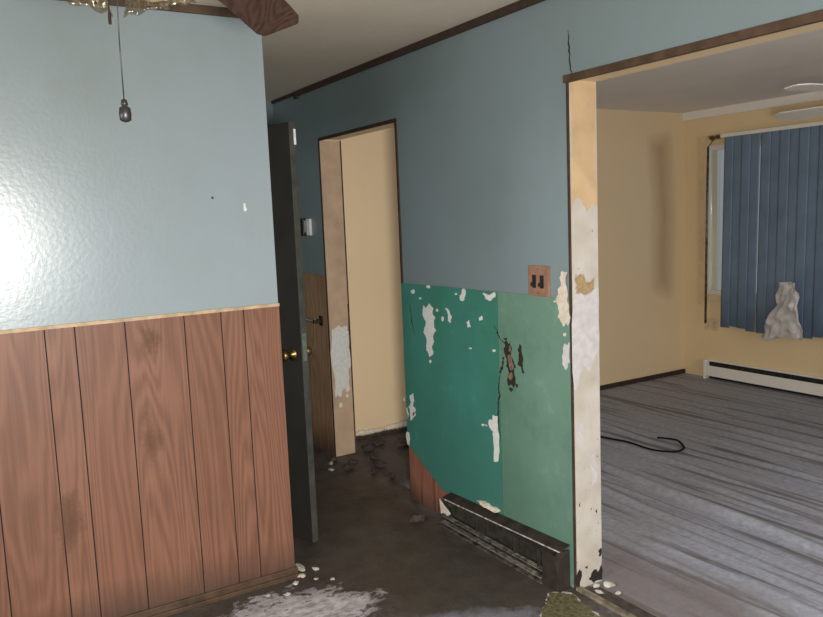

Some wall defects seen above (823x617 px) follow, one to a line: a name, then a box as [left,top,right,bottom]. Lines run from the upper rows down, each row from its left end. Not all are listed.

peeling [411,289,452,363]
peeling [553,271,599,393]
peeling [330,325,351,408]
crack [495,374,503,440]
peeling [481,415,499,462]
peeling [590,453,598,486]
spalling [577,548,621,595]
leakage [233,583,388,617]
leakage [444,607,532,617]